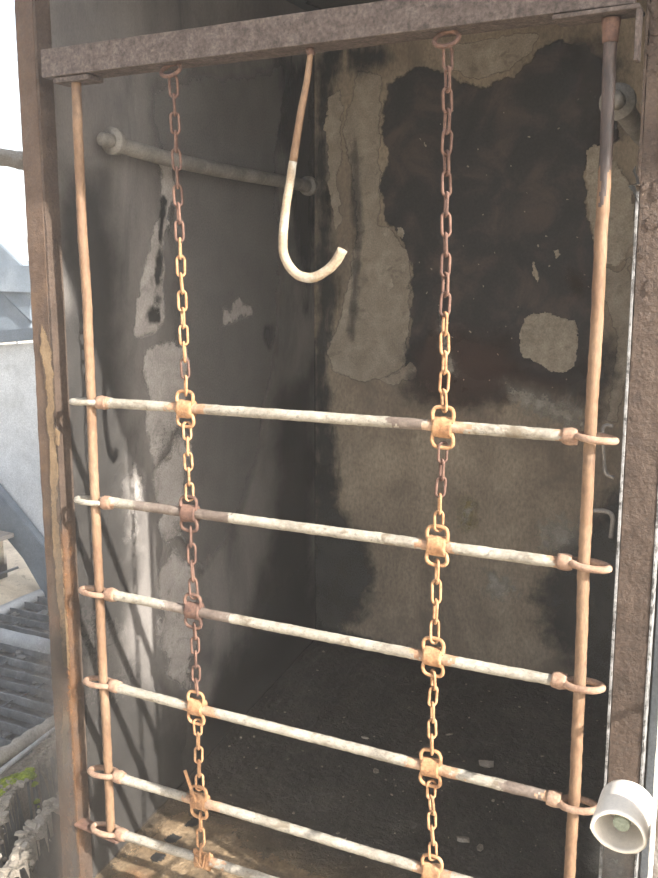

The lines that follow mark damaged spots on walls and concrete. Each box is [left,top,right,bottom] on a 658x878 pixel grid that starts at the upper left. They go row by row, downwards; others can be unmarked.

peeling [133,165,176,337]
peeling [323,39,603,407]
peeling [598,158,634,422]
peeling [142,342,189,466]
leakage [505,382,583,427]
leakage [532,568,577,670]
leakage [541,516,579,557]
leakage [586,489,619,692]